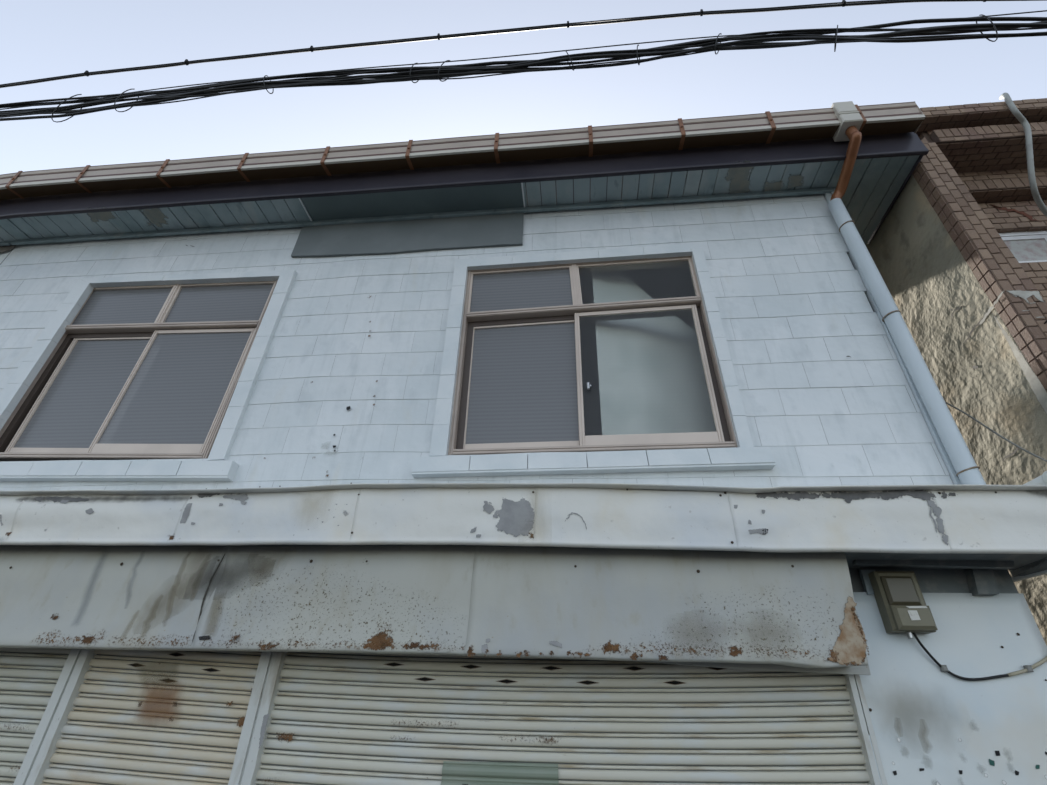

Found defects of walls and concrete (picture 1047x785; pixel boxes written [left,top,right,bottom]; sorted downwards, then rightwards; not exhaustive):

peeling [483,497,535,537]
peeling [755,490,956,545]
rust [35,572,501,657]
rust [567,640,820,662]
rust [138,690,177,721]